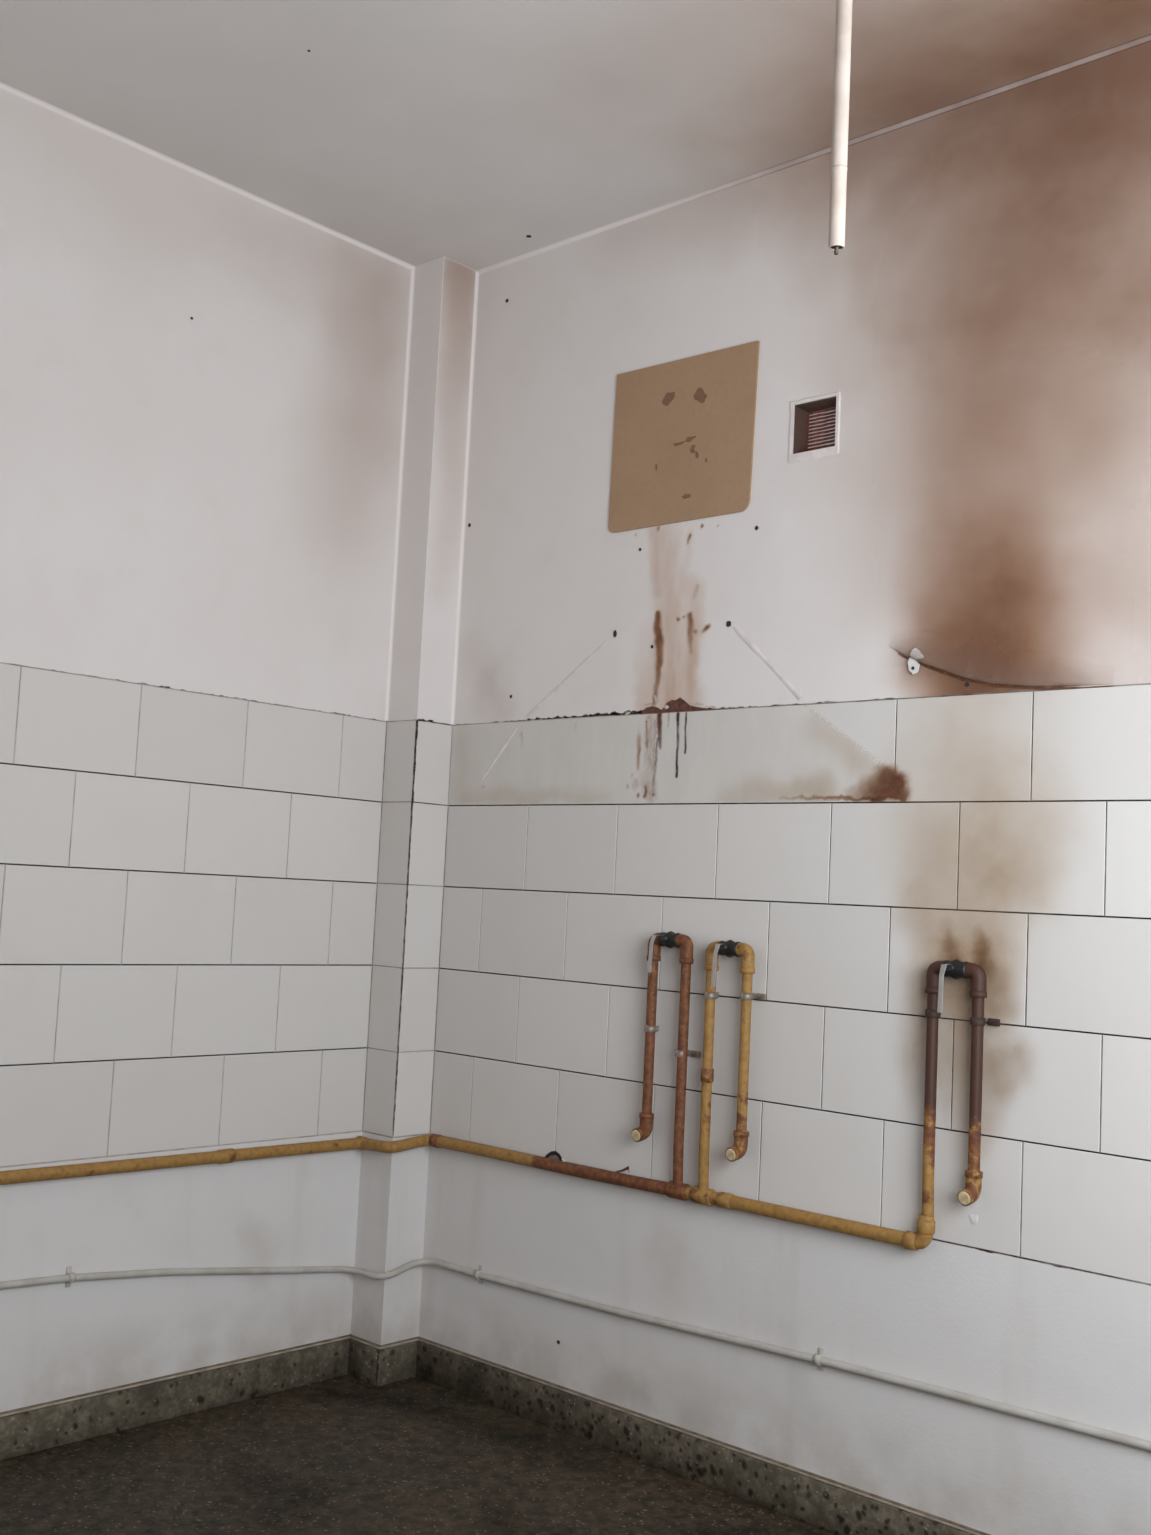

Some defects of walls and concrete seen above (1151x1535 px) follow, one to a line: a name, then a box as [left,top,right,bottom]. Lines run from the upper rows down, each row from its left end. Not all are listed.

corrosion [657,712,687,778]
corrosion [853,769,906,802]